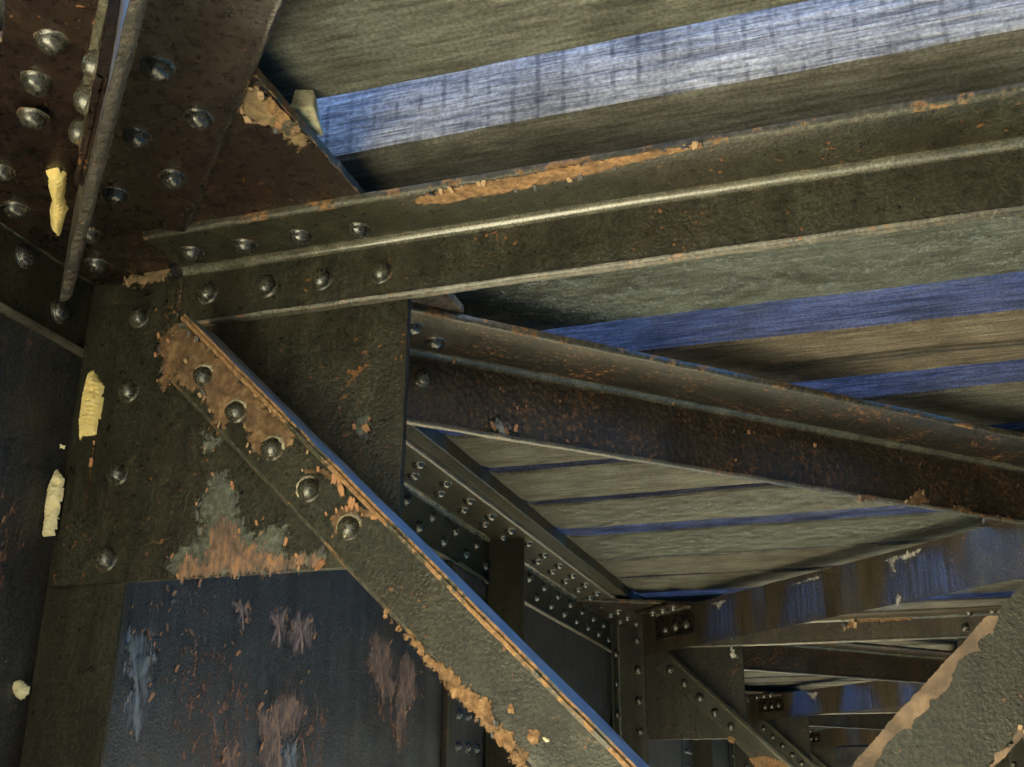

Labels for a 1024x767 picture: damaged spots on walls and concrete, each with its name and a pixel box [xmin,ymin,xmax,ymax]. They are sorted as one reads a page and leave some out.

peeling [154,283,296,463]
corrosion [857,487,930,506]
peeling [117,466,378,742]
corrosion [218,686,308,767]
corrosion [365,627,424,759]
peeling [379,602,541,767]
peeling [853,615,999,767]